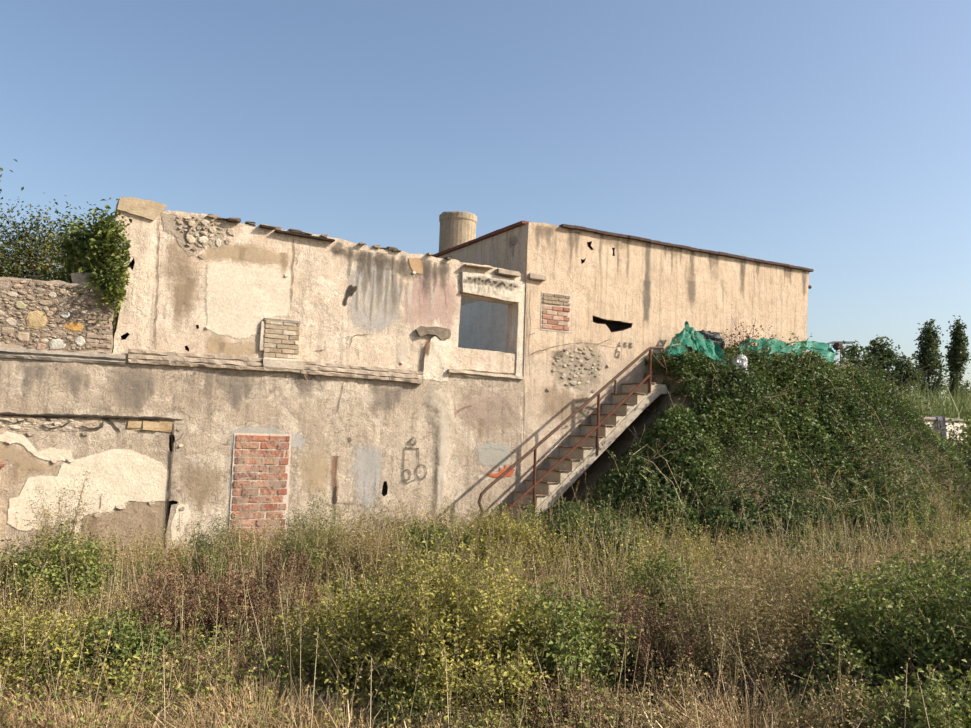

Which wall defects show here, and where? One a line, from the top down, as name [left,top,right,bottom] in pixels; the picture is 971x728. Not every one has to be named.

crack [153,224,161,350]
peeling [161,212,291,339]
crack [290,239,298,302]
damp [332,242,455,330]
flaking render [551,344,611,392]
peeling [0,416,169,533]
flaking render [174,422,186,452]
flaking render [170,504,191,546]